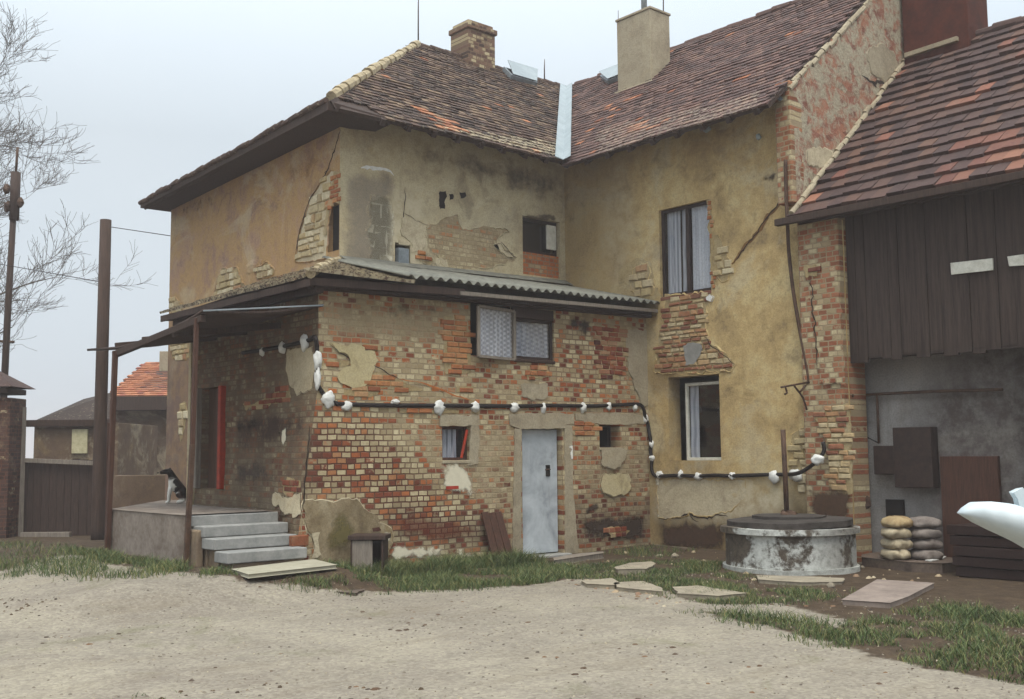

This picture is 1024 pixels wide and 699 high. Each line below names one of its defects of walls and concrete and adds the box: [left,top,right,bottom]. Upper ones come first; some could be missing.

flaking render [805,146,833,169]
spalling [294,169,341,263]
spalling [367,191,517,270]
crack [729,203,780,268]
spalling [593,199,736,407]
crack [809,281,818,365]
flaking render [243,342,423,410]
spalling [787,403,856,495]
damp [658,515,723,548]
peeling [656,477,747,521]